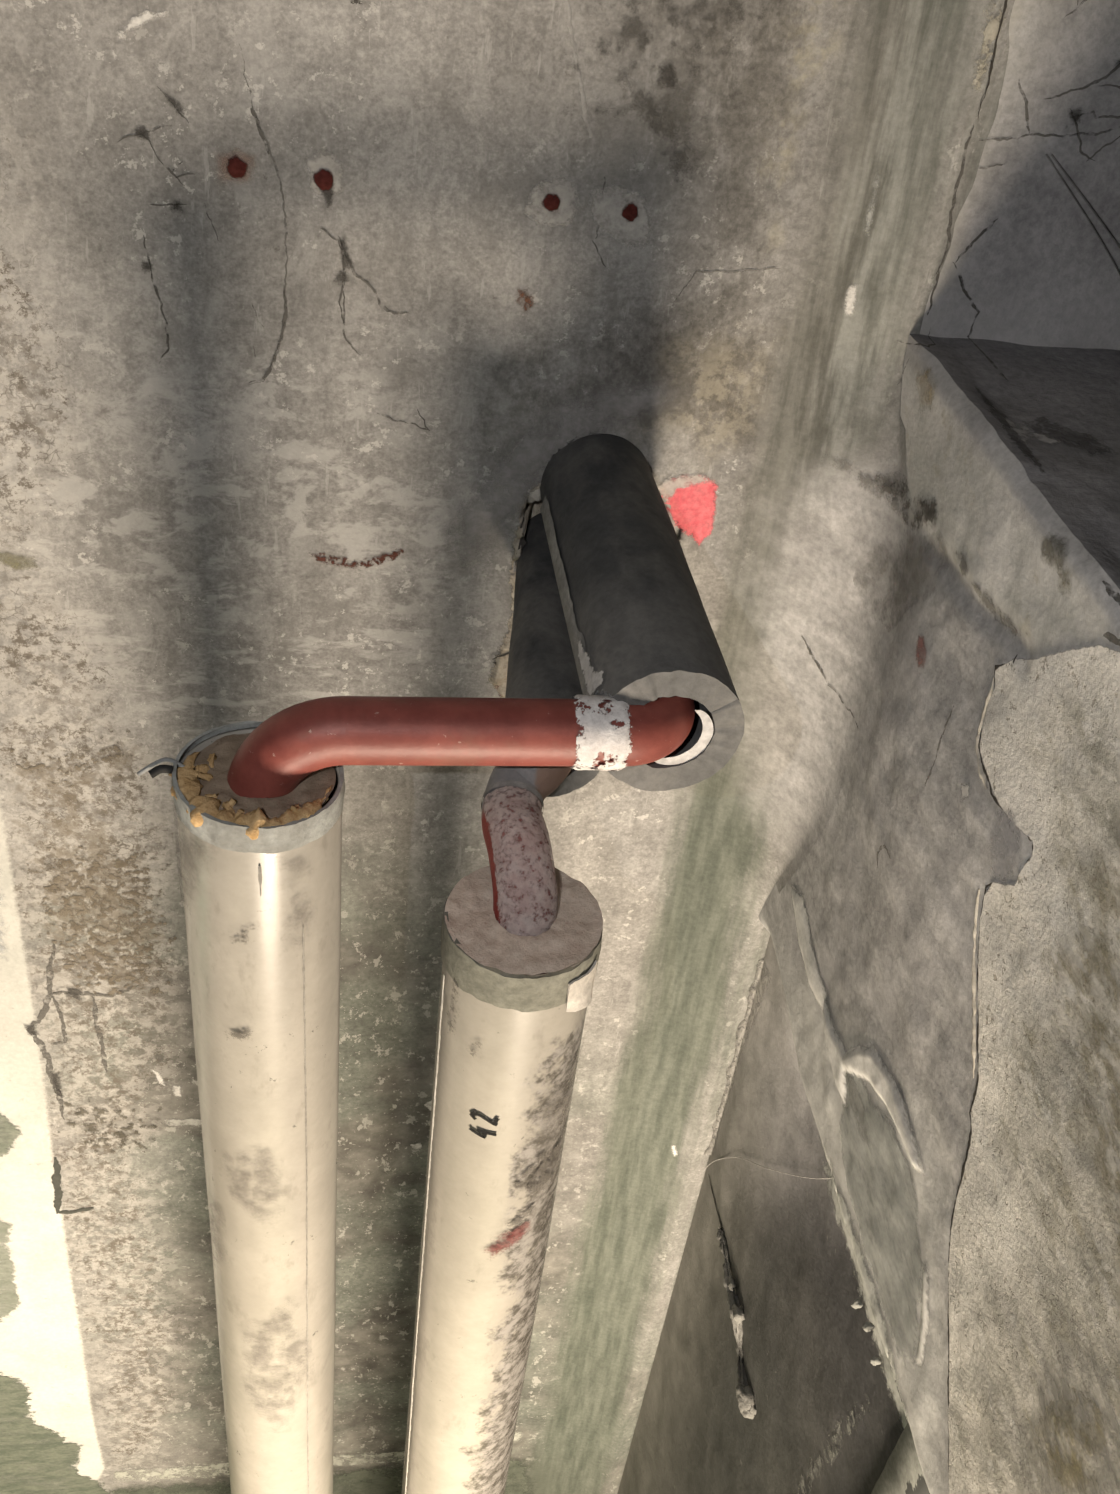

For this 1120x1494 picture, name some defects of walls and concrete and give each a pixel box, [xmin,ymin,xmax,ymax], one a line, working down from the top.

crack [239,44,408,384]
leakage [603,2,649,53]
leakage [635,65,696,171]
crack [897,60,1120,385]
flaking render [489,483,542,698]
mould [876,476,945,604]
crack [25,942,139,1120]
peeling [948,645,1120,1494]